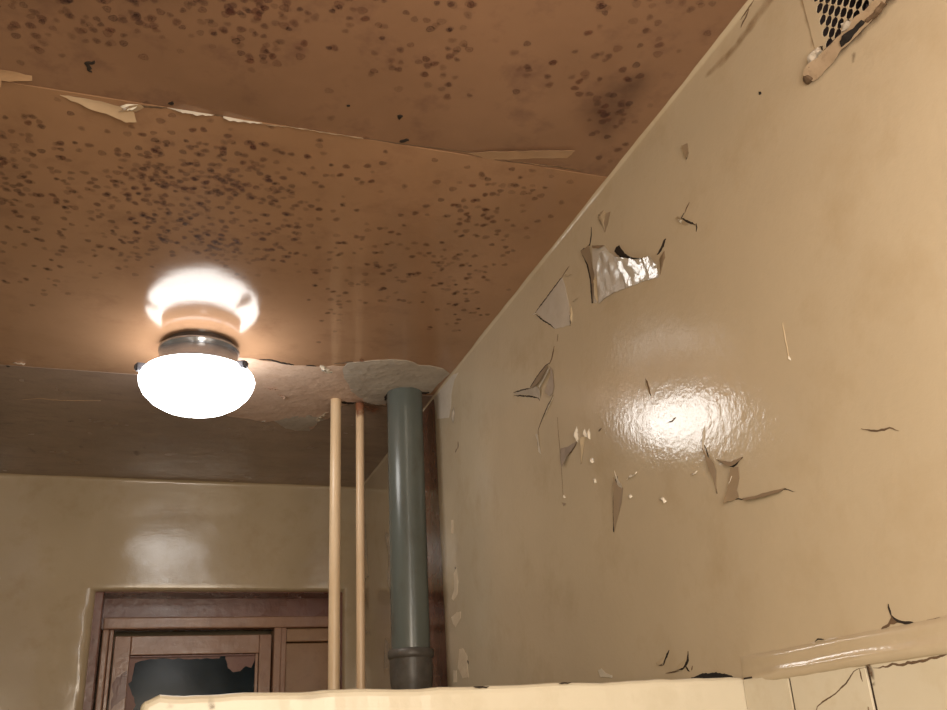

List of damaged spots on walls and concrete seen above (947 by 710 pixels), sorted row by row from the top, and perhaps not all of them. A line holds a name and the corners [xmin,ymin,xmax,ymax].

peeling [0,70,32,87]
flaking render [803,0,889,85]
peeling [60,95,580,171]
peeling [580,228,666,303]
peeling [513,267,579,401]
flaking render [225,357,458,431]
peeling [560,426,594,468]
peeling [613,471,637,532]
peeling [691,426,793,503]
crack [863,425,899,433]
crack [881,604,939,629]
crack [816,667,867,710]